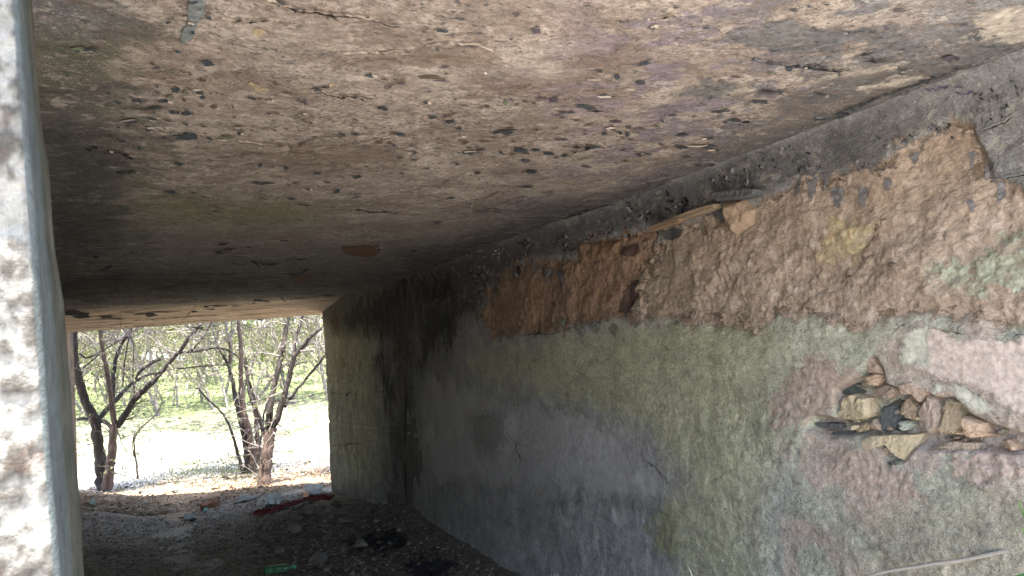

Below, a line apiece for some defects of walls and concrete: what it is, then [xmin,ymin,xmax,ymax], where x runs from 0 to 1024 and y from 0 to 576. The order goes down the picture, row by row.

crack [222,0,401,28]
spalling [64,0,1024,415]
spalling [828,438,924,512]